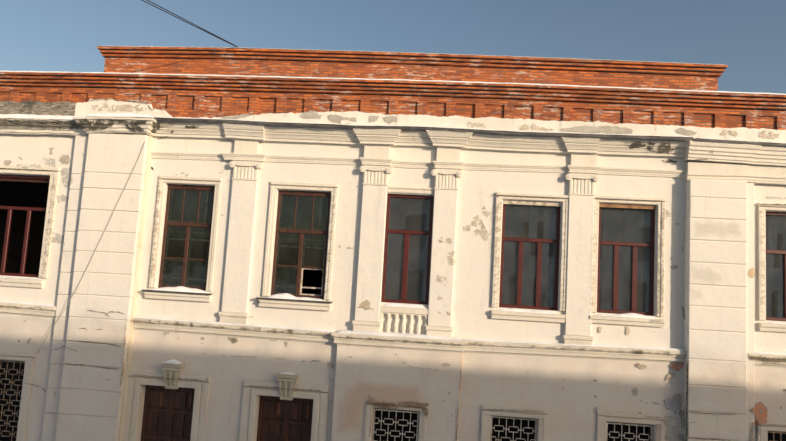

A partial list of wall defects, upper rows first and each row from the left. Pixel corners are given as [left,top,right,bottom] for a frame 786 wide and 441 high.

peeling [562,126,677,163]
peeling [4,147,72,278]
peeling [463,202,502,296]
crack [55,310,124,370]
peeling [633,388,685,441]
spalling [666,363,685,381]
crack [685,362,734,441]
spalling [751,402,768,441]